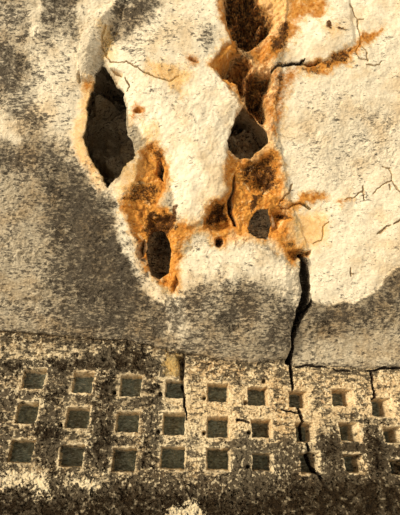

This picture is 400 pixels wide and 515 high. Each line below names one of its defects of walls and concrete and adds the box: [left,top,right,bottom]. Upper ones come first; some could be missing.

water stain [39,0,84,35]
water stain [111,0,162,49]
water stain [0,33,36,93]
rust [207,0,386,138]
rust [117,140,328,295]
water stain [37,162,210,352]
water stain [203,285,260,342]
crack [284,253,351,391]
crack [180,385,188,421]
crack [367,366,400,400]
crack [281,405,323,480]